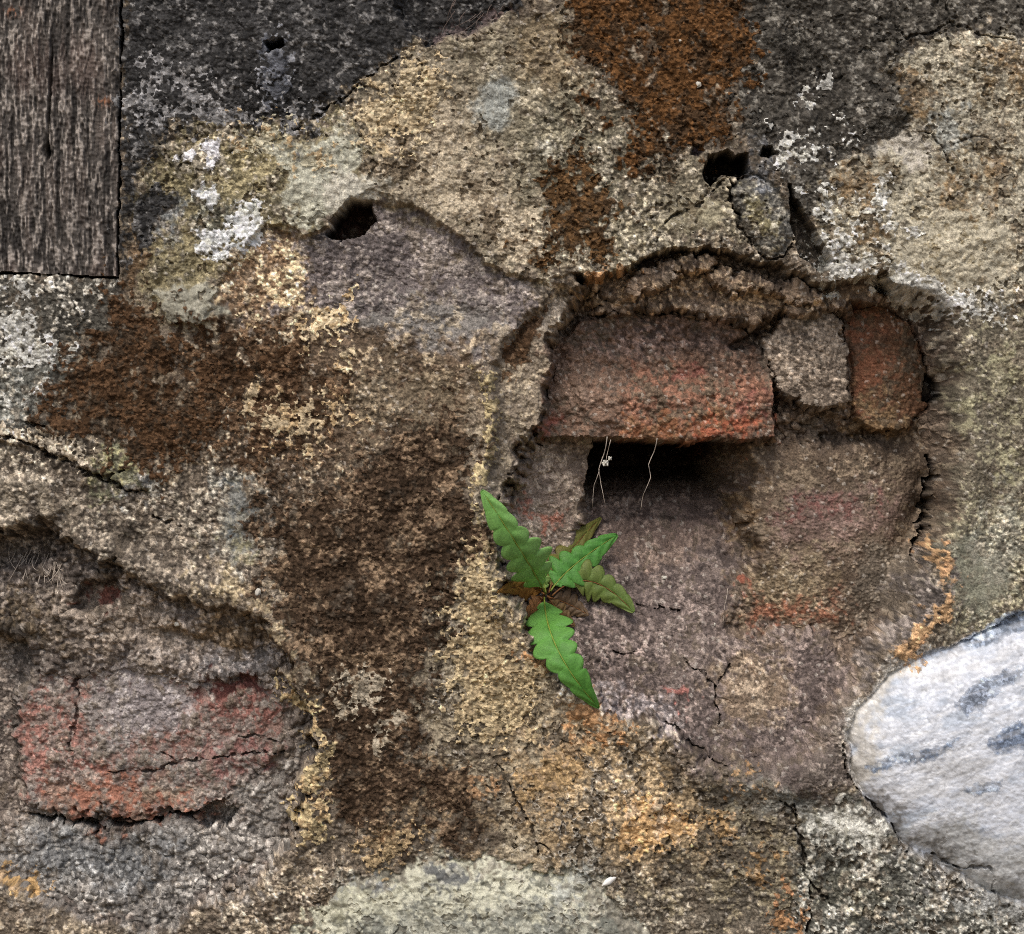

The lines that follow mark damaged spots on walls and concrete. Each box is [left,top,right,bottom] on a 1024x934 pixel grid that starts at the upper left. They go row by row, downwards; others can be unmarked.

water stain [105,0,523,271]
crack [664,175,826,276]
spalling [224,207,534,462]
spalling [549,248,956,464]
crack [0,418,182,529]
crack [909,454,941,557]
crack [636,604,681,612]
spalling [428,364,908,769]
crack [68,676,81,752]
crack [109,733,286,774]
crack [659,718,729,768]
crack [684,657,732,688]